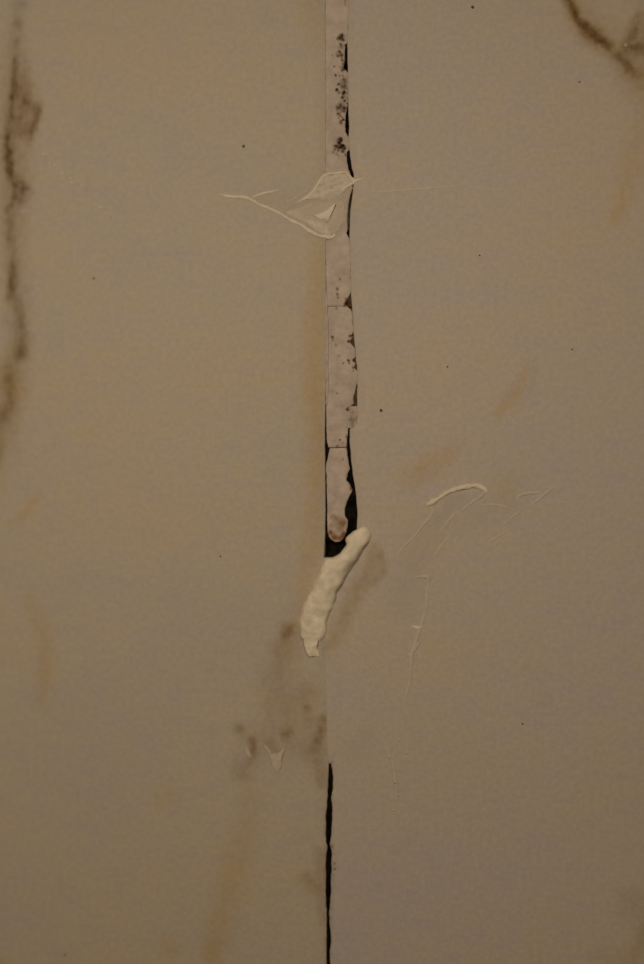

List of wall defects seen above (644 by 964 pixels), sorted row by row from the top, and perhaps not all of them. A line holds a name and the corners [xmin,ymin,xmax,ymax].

crack [342,44,350,72]
crack [345,107,354,240]
crack [325,277,357,541]
crack [325,763,333,964]